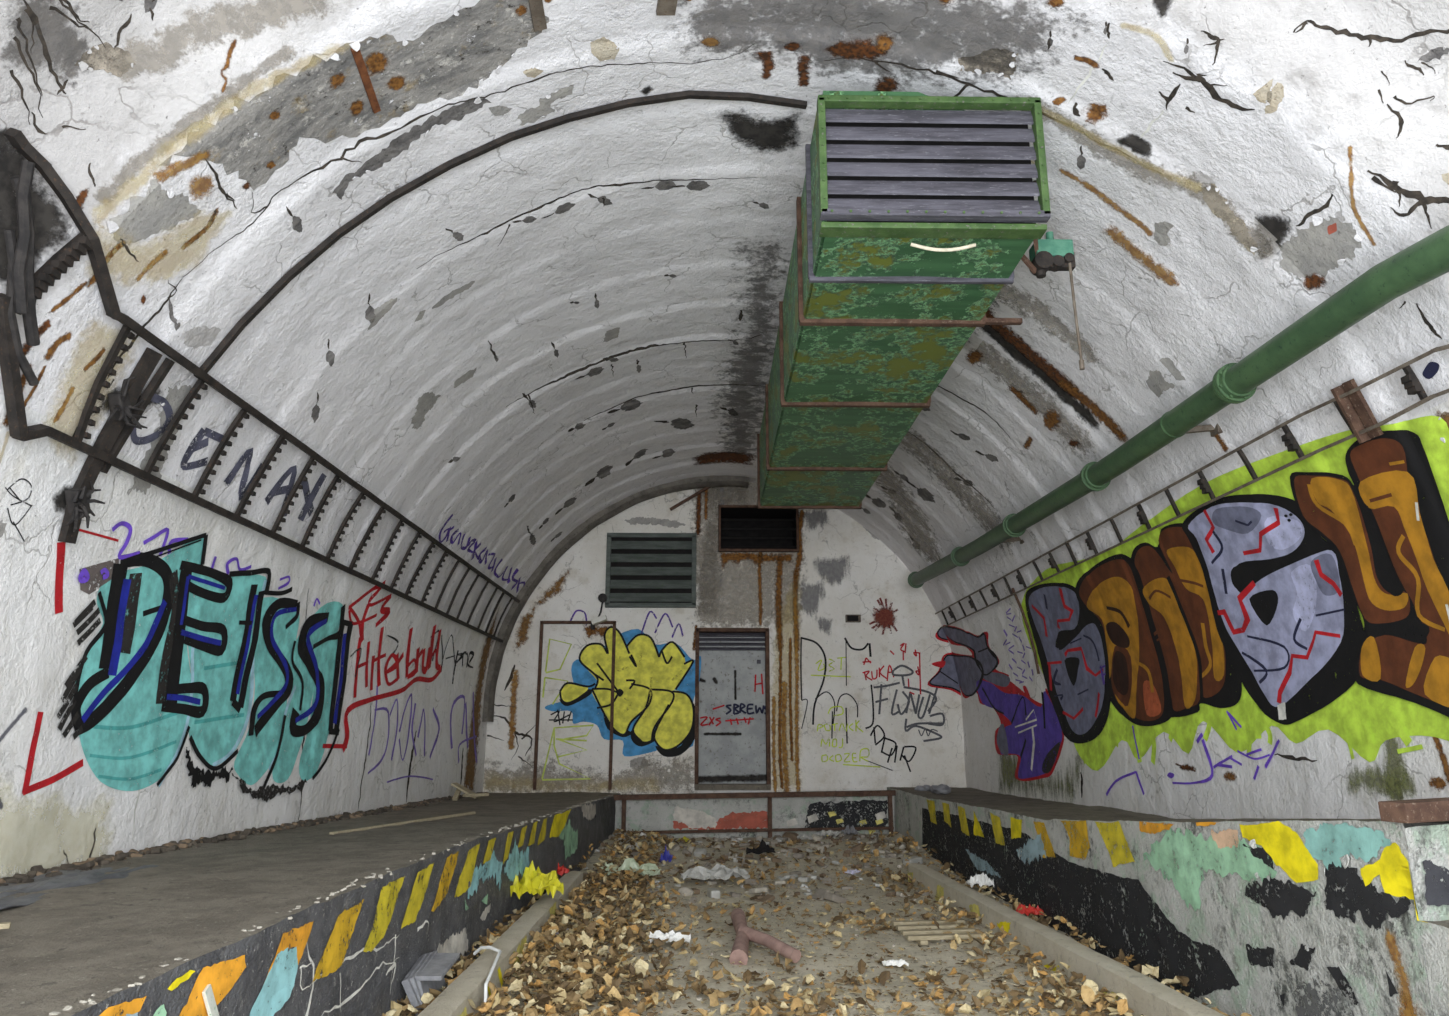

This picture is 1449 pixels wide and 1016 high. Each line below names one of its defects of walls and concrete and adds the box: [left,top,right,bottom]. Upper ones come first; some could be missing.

crack [10,0,106,187]
flaking render [106,0,574,245]
rust [755,42,811,86]
crack [1159,31,1255,113]
crack [1293,20,1449,138]
crack [72,45,765,437]
rust [1059,169,1179,286]
flaking render [1200,183,1258,255]
flaking render [1279,215,1362,282]
crack [1367,170,1449,229]
rust [21,275,96,407]
rust [721,510,804,792]